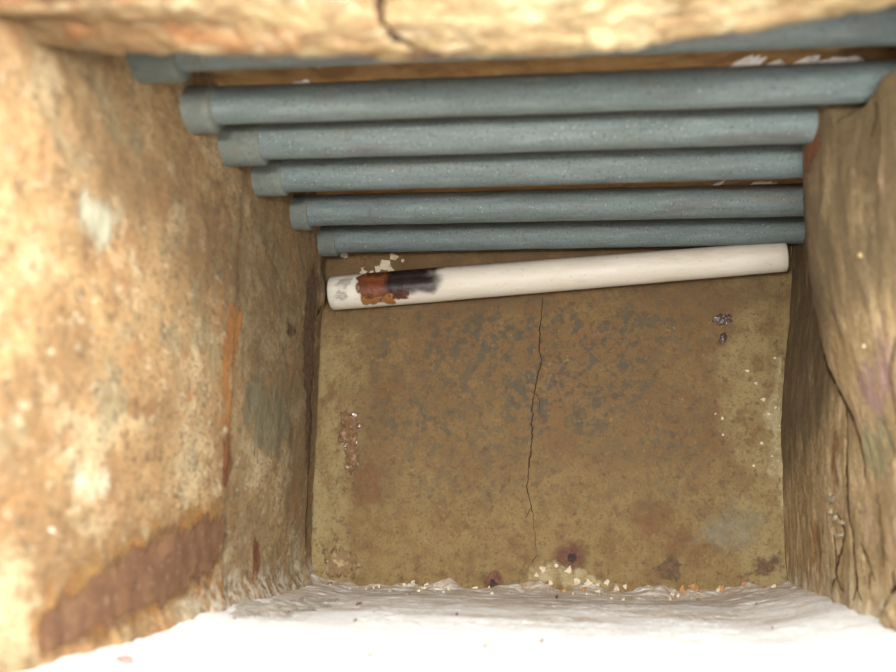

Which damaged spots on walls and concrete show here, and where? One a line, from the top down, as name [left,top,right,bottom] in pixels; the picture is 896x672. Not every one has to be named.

crack [374,0,418,50]
crack [525,298,543,563]
crack [807,257,896,607]
corrosion [33,501,227,655]
corrosion [485,571,501,587]
corrosion [557,544,583,568]